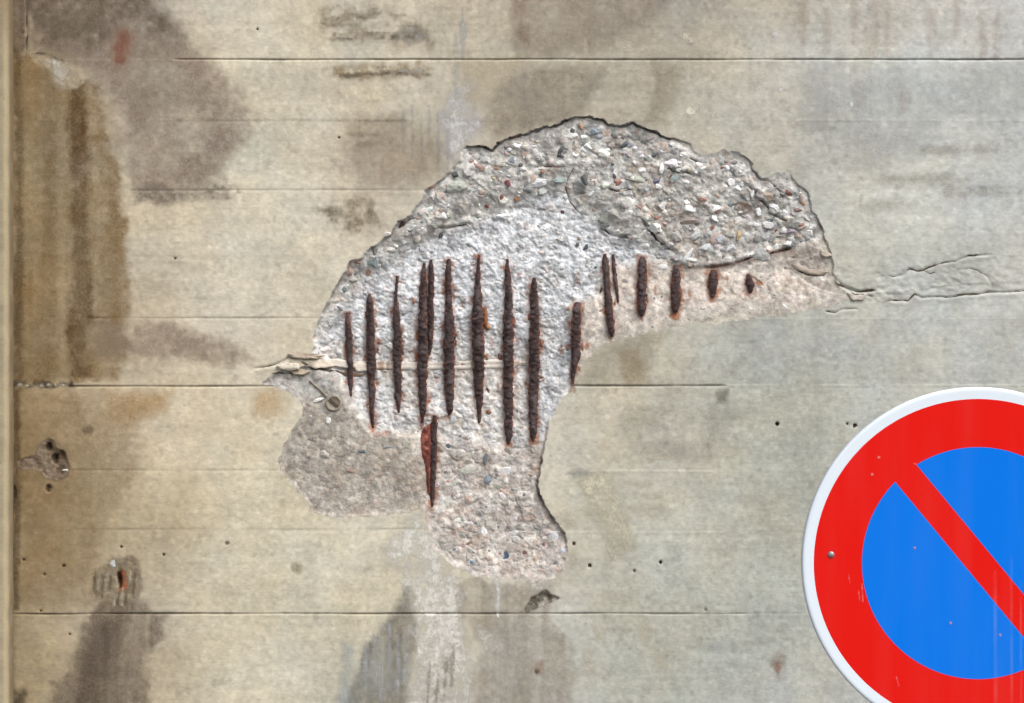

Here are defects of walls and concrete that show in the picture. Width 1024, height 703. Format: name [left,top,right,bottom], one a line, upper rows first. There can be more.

water stain [13,0,238,382]
corrosion [599,254,619,337]
corrosion [635,256,656,316]
corrosion [670,265,690,320]
corrosion [705,270,719,302]
corrosion [745,274,763,293]
crack [827,254,1024,313]
corrosion [344,254,544,510]
spalling [260,115,867,613]
corrosion [560,302,589,384]
water stain [53,602,162,703]